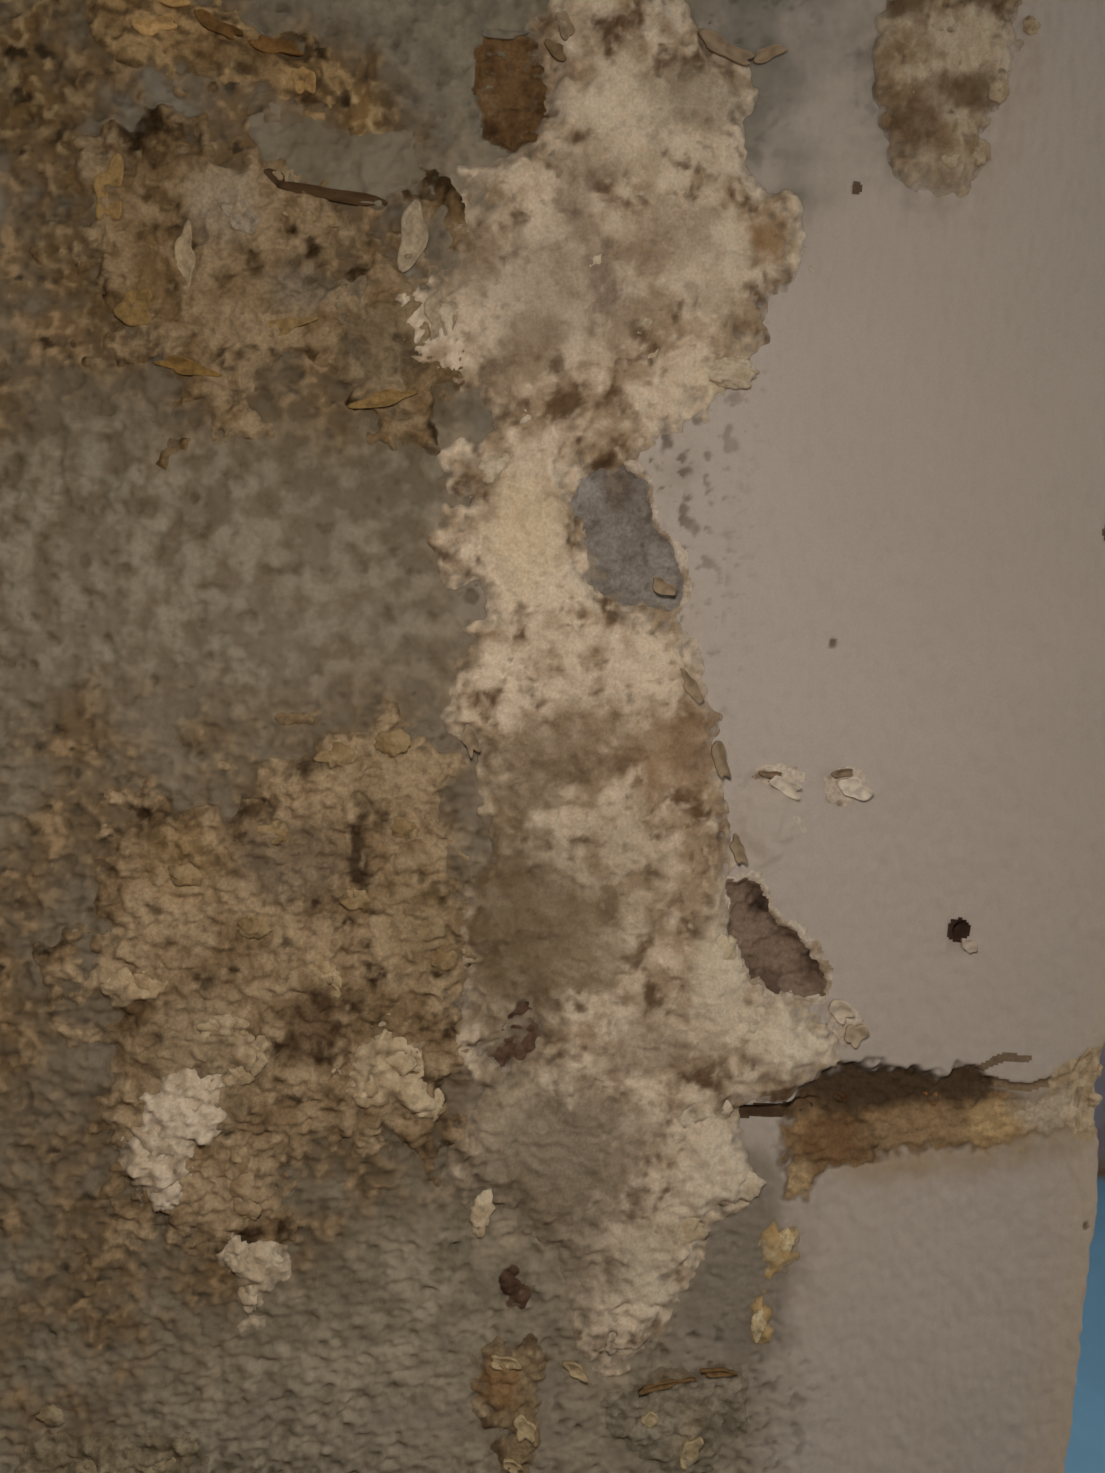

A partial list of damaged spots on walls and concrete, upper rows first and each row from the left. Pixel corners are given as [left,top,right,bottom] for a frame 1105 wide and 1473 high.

spalling [471,28,567,153]
flaking render [60,0,469,456]
spalling [852,181,863,195]
spalling [564,459,693,616]
leakage [0,0,847,1473]
peeling [752,763,806,800]
peeling [824,766,874,807]
flaking render [32,695,542,1257]
flaking render [722,870,1104,1200]
spalling [499,1264,535,1310]
flaking render [470,1333,588,1473]
flaking render [600,1220,800,1473]